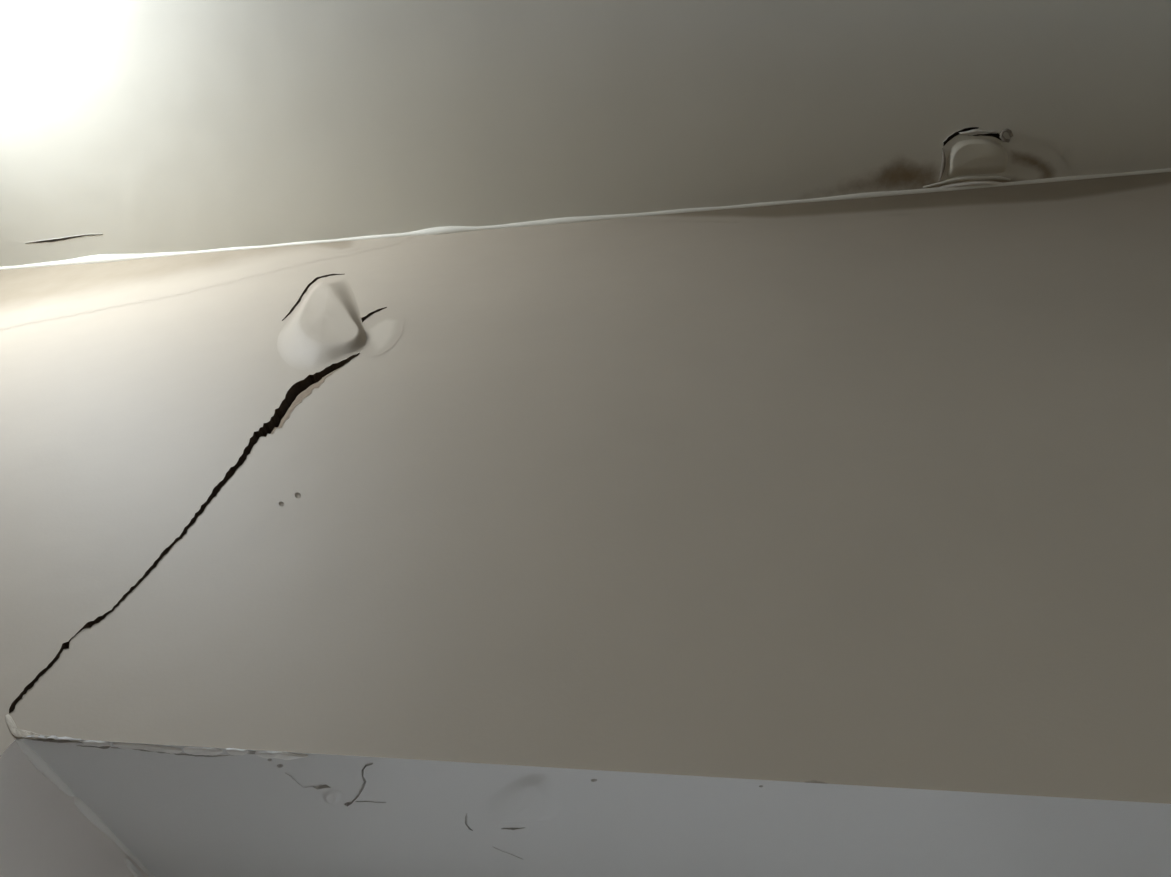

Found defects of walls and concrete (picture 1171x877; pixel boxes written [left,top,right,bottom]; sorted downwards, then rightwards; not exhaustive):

leakage [611,138,1171,223]
crack [9,353,360,714]